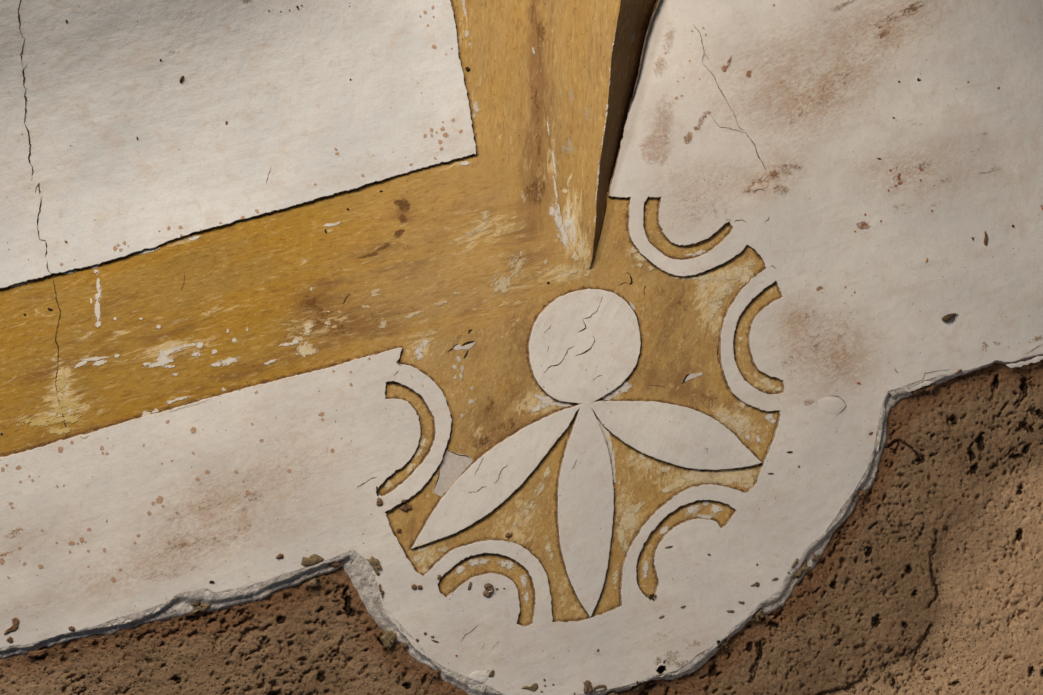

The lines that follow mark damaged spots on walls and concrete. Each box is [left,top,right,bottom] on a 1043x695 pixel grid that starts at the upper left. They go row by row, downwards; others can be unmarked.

crack [694,26,766,170]
crack [18,0,67,437]
peeling [113,241,159,254]
peeling [90,265,102,327]
peeling [143,342,239,376]
peeling [278,311,341,358]
crack [545,272,645,372]
peeling [16,354,120,453]
peeling [142,396,209,423]
peeling [433,450,473,497]
peeling [455,558,530,605]
flaking render [0,550,504,695]